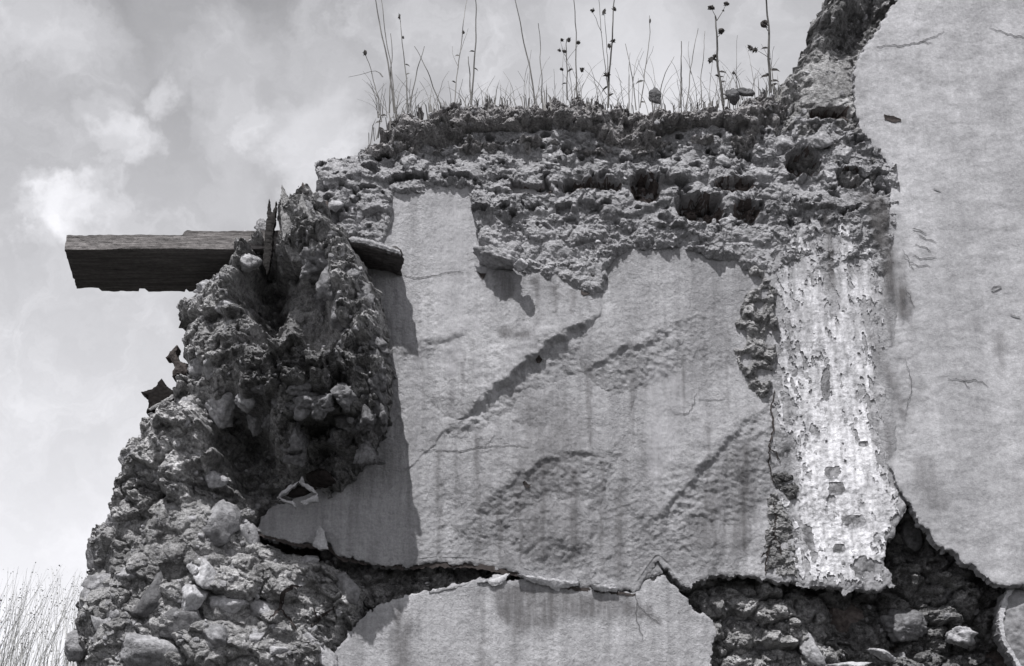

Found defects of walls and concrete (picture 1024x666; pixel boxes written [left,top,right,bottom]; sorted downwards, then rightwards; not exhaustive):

hole [810,105,850,121]
hole [510,171,659,203]
hole [676,176,761,226]
crack [412,435,520,452]
peeling [645,213,1024,666]
crack [259,526,663,640]